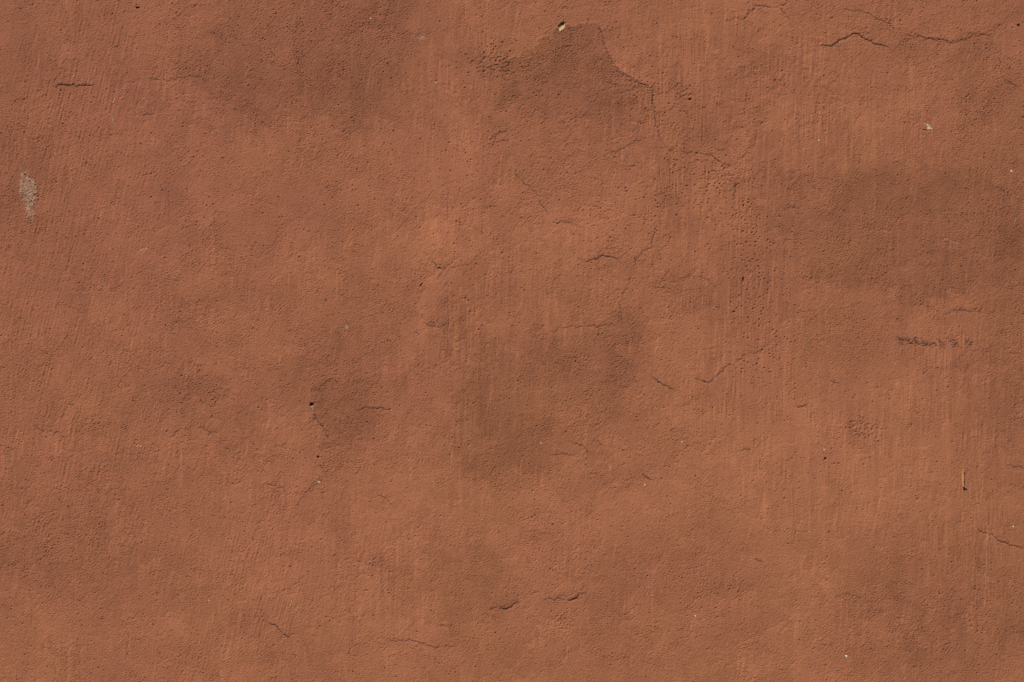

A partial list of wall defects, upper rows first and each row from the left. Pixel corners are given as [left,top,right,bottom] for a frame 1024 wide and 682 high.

crack [599,27,758,167]
crack [819,8,1017,87]